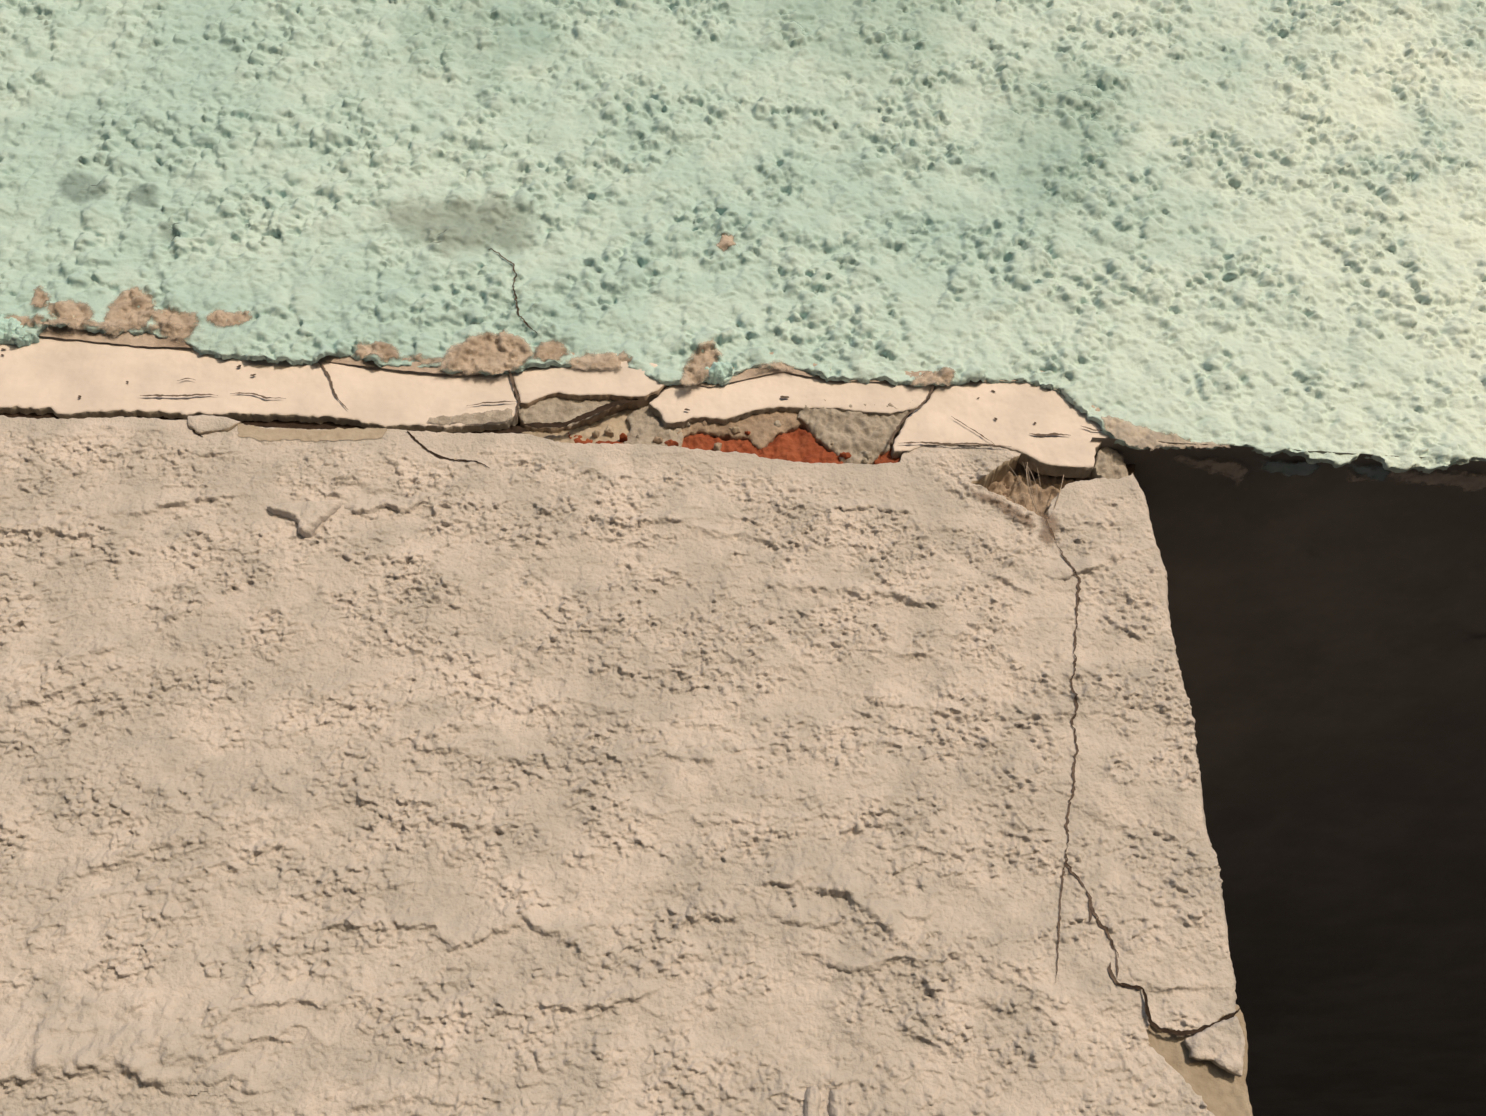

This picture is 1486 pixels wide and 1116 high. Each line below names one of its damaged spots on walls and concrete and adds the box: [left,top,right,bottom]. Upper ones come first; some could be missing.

peeling [4,286,252,342]
crack [0,411,59,419]
crack [125,362,530,468]
flaking render [355,330,955,465]
crack [1046,520,1124,987]
flaking render [1116,983,1253,1116]